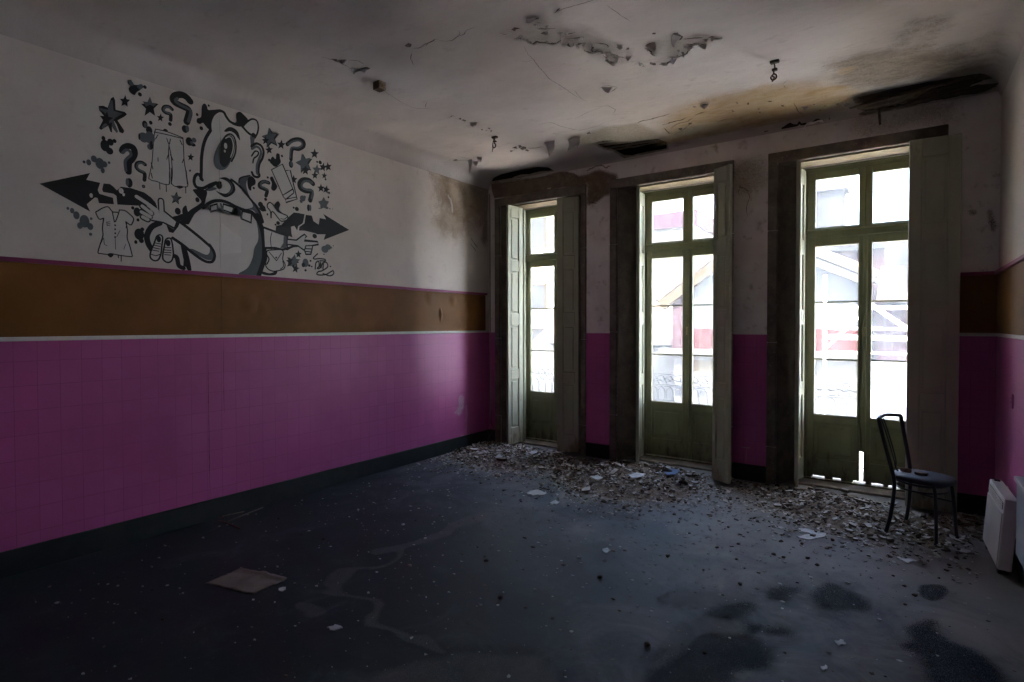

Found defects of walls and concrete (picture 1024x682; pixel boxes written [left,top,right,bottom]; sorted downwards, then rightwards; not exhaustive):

peeling [500,8,722,75]
damp [580,12,1009,147]
flaking render [568,121,693,158]
damp [426,172,488,250]
damp [579,169,618,206]